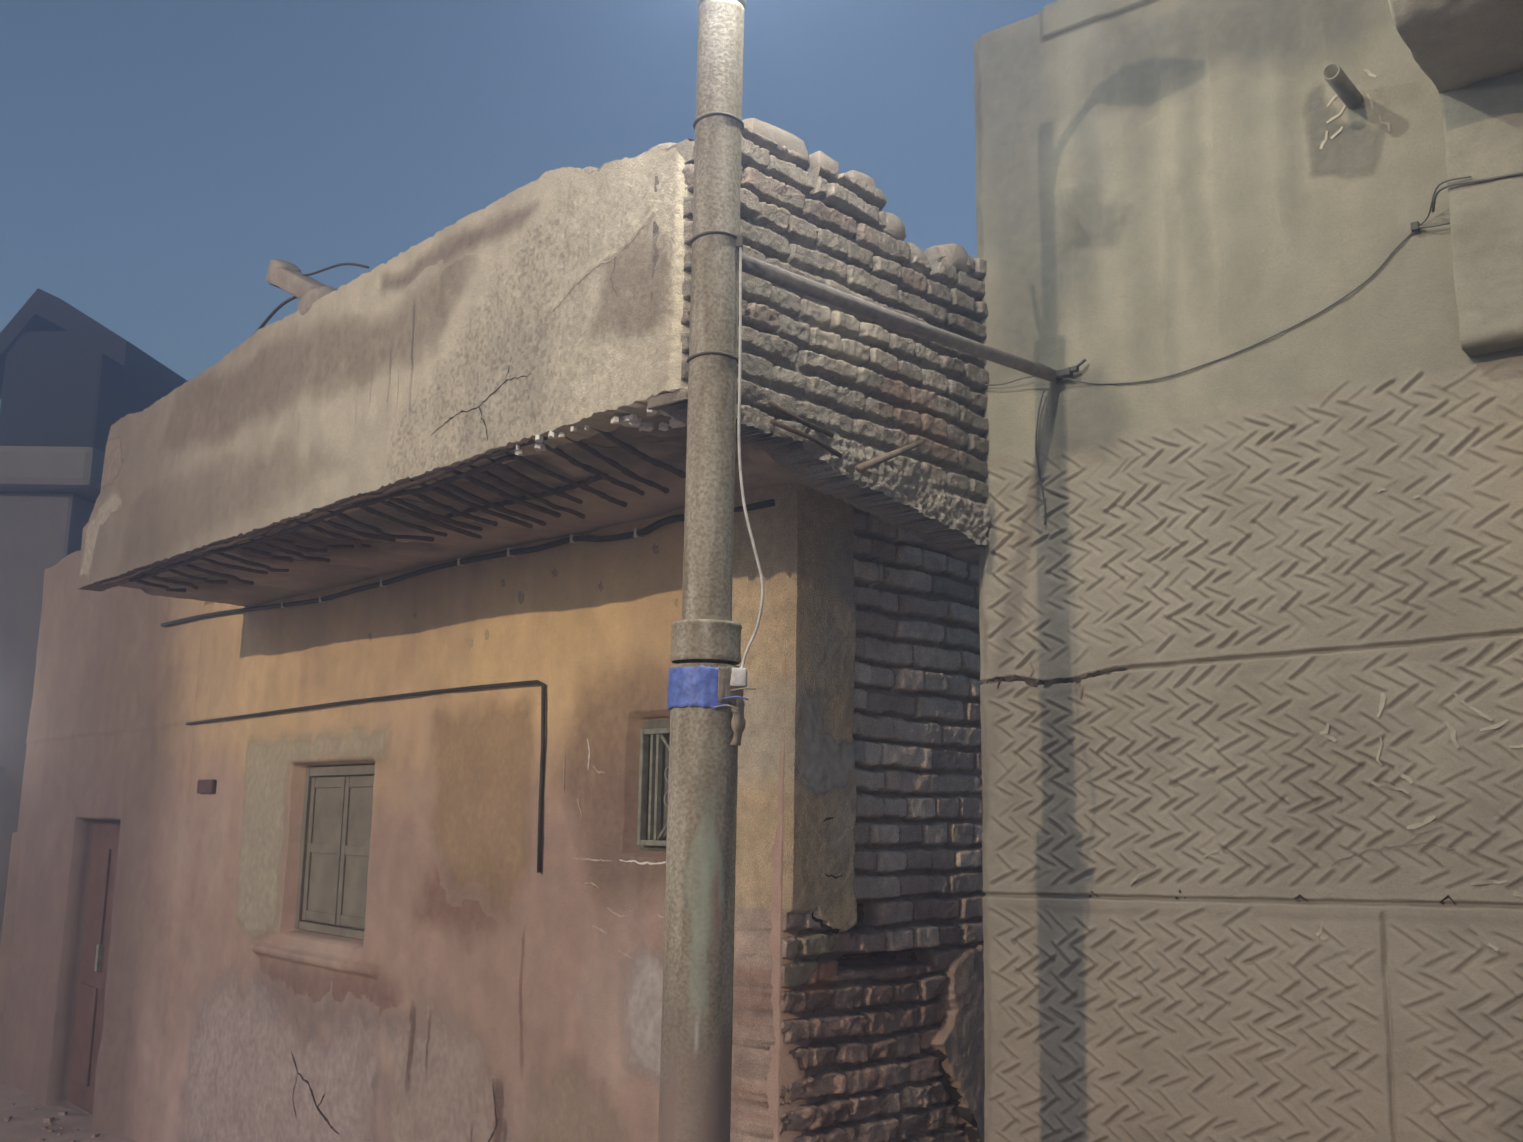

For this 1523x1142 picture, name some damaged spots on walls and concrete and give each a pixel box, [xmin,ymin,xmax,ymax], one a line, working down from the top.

crack [431,356,528,440]
spalling [767,401,843,458]
spalling [848,903,866,931]
crack [291,1052,339,1134]
peeling [180,976,507,1142]
crack [931,1049,983,1142]